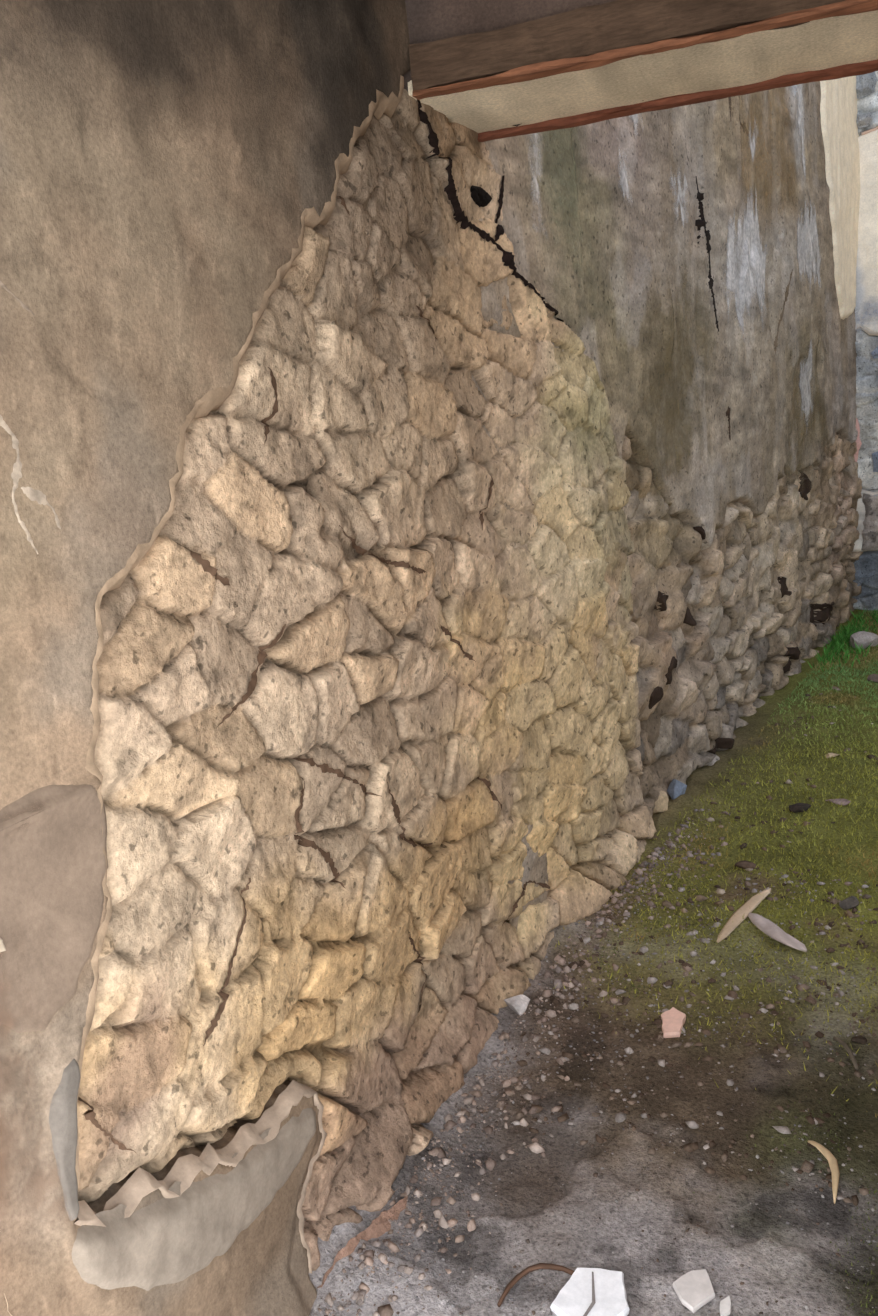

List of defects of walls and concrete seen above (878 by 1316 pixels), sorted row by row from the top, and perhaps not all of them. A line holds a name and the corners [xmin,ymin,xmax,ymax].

crack [417,100,564,322]
crack [695,176,719,332]
spalling [856,71,878,136]
spalling [74,75,657,1274]
spalling [622,325,878,816]
spalling [316,1196,408,1290]